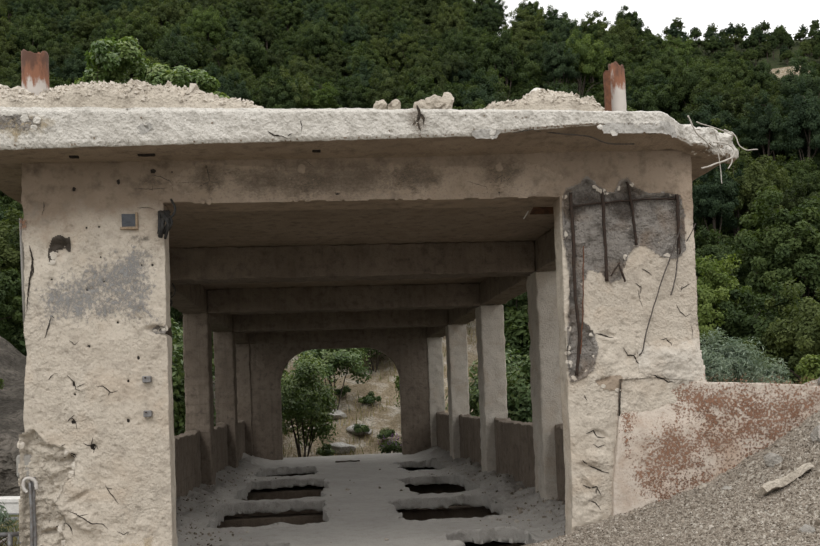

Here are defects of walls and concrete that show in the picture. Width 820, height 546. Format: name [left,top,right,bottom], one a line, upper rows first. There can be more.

crack [26,246,34,312]
spalling [48,235,71,266]
spalling [169,162,686,393]
spalling [638,338,707,385]
spalling [17,429,77,546]
corrosion [619,374,820,502]